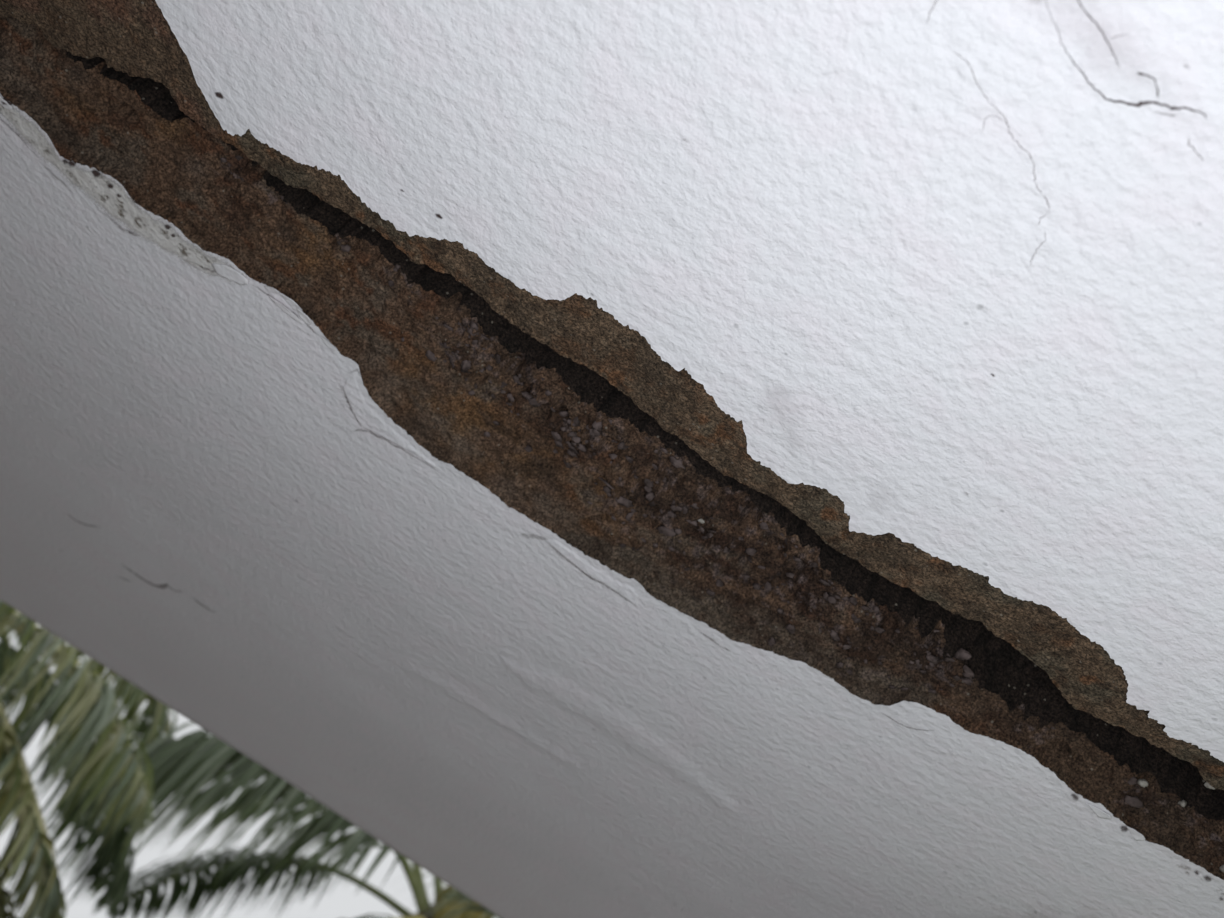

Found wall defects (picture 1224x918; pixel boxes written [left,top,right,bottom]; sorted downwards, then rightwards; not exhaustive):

spalling [64,49,105,70]
spalling [100,64,195,122]
peeling [0,96,249,285]
spalling [263,170,1224,821]